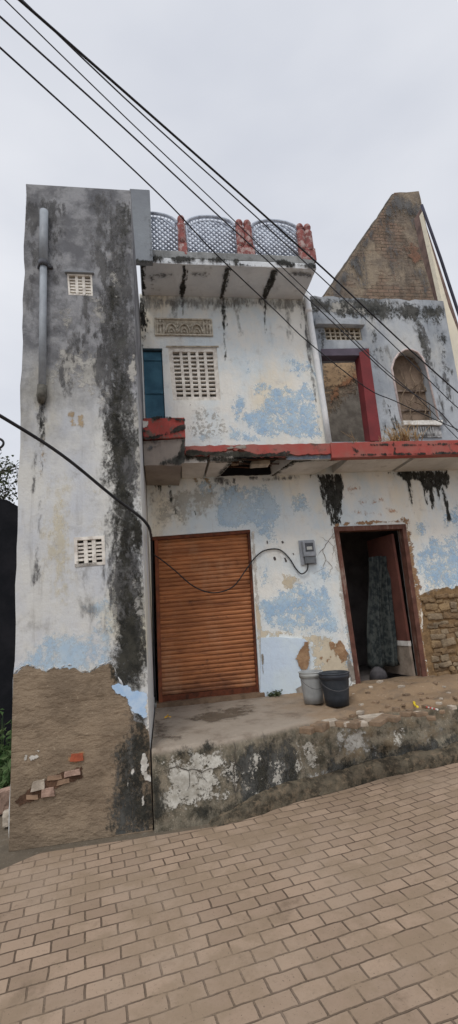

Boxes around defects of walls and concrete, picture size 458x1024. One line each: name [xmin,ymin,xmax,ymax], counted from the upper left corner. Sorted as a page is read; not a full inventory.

leakage [25,199,65,266]
leakage [334,195,422,352]
leakage [59,194,147,691]
peeling [127,355,136,381]
peeling [133,359,331,505]
leakage [140,249,458,456]
leakage [310,474,344,527]
leakage [388,470,451,521]
spalling [251,508,458,683]
peeling [0,629,328,852]